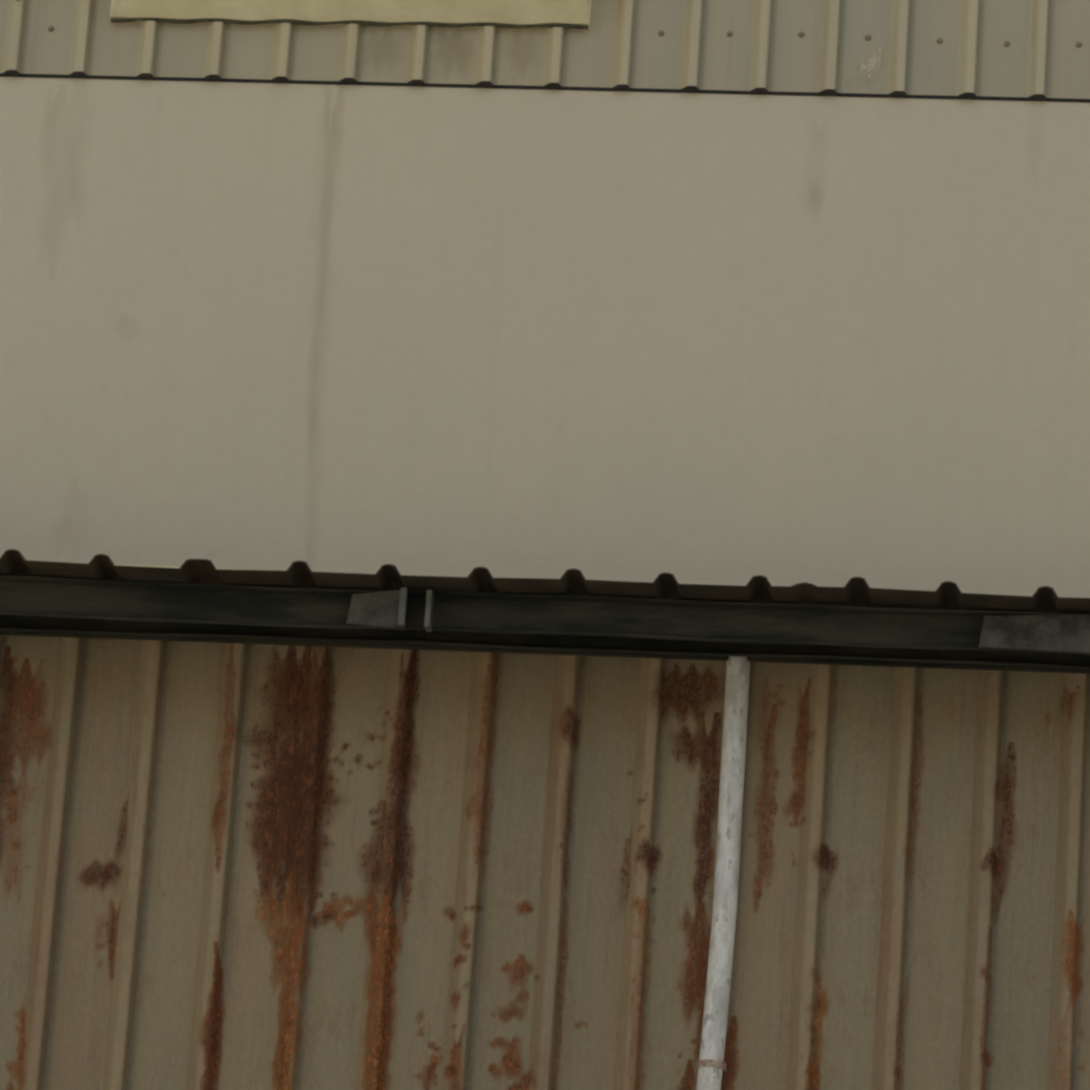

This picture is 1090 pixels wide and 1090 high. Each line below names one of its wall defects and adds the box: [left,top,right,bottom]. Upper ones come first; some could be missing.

rust [81,800,128,890]
rust [97,901,119,978]
rust [200,941,225,1090]
rust [317,650,420,1090]
rust [417,1013,466,1090]
rust [654,663,725,1090]
rust [753,678,815,907]
rust [981,742,1017,934]